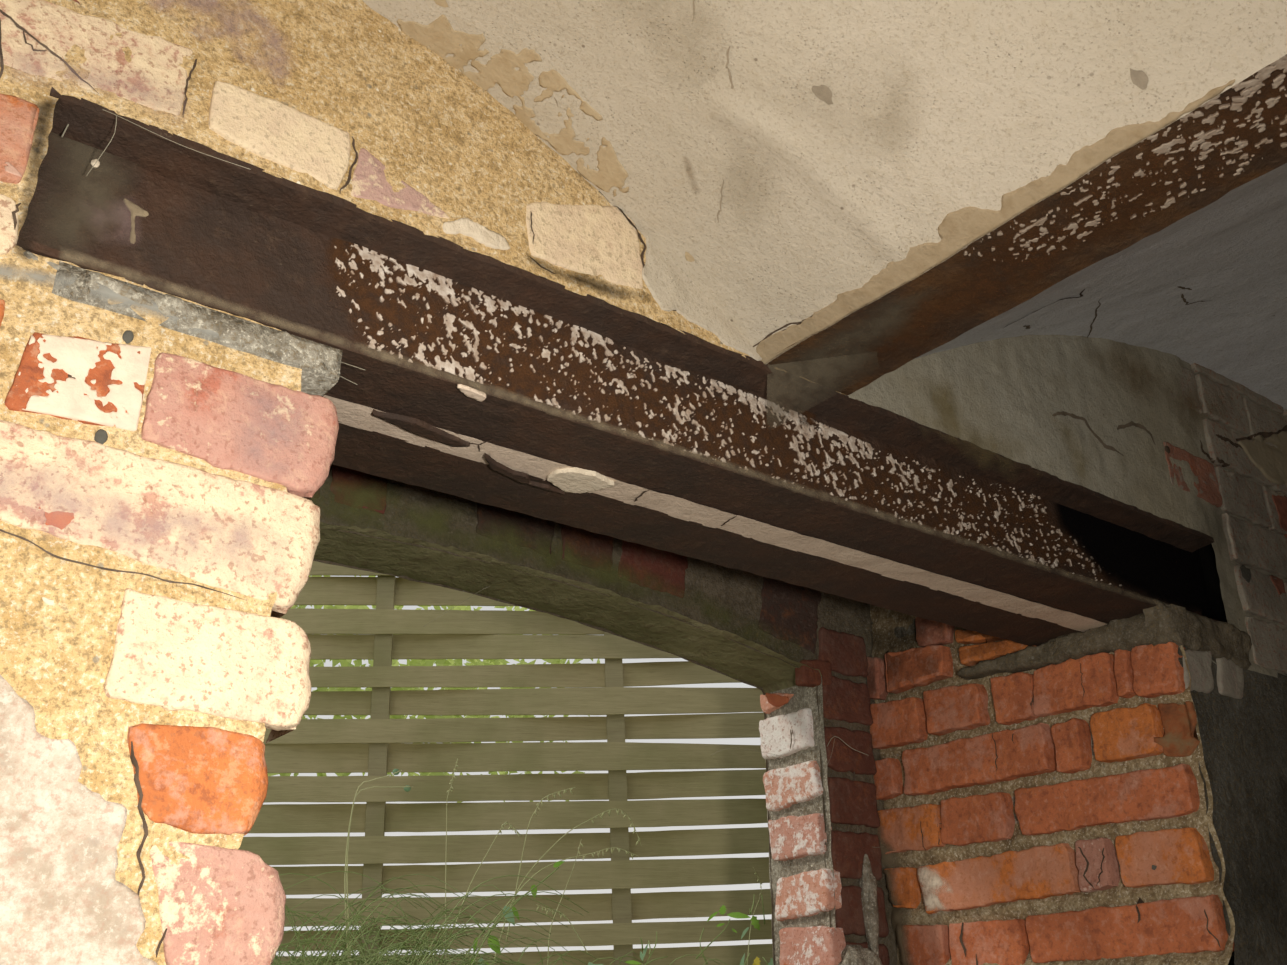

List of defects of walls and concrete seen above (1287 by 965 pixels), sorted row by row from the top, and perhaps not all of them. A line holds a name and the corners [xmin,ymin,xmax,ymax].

crack [0,9,99,94]
crack [726,46,734,89]
flaking render [395,0,629,197]
peeling [16,334,151,431]
corrosion [457,384,486,402]
corrosion [373,409,470,447]
crack [1052,411,1156,456]
corrosion [485,453,565,494]
flaking render [0,675,158,965]
crack [130,741,148,895]
crack [156,928,167,957]